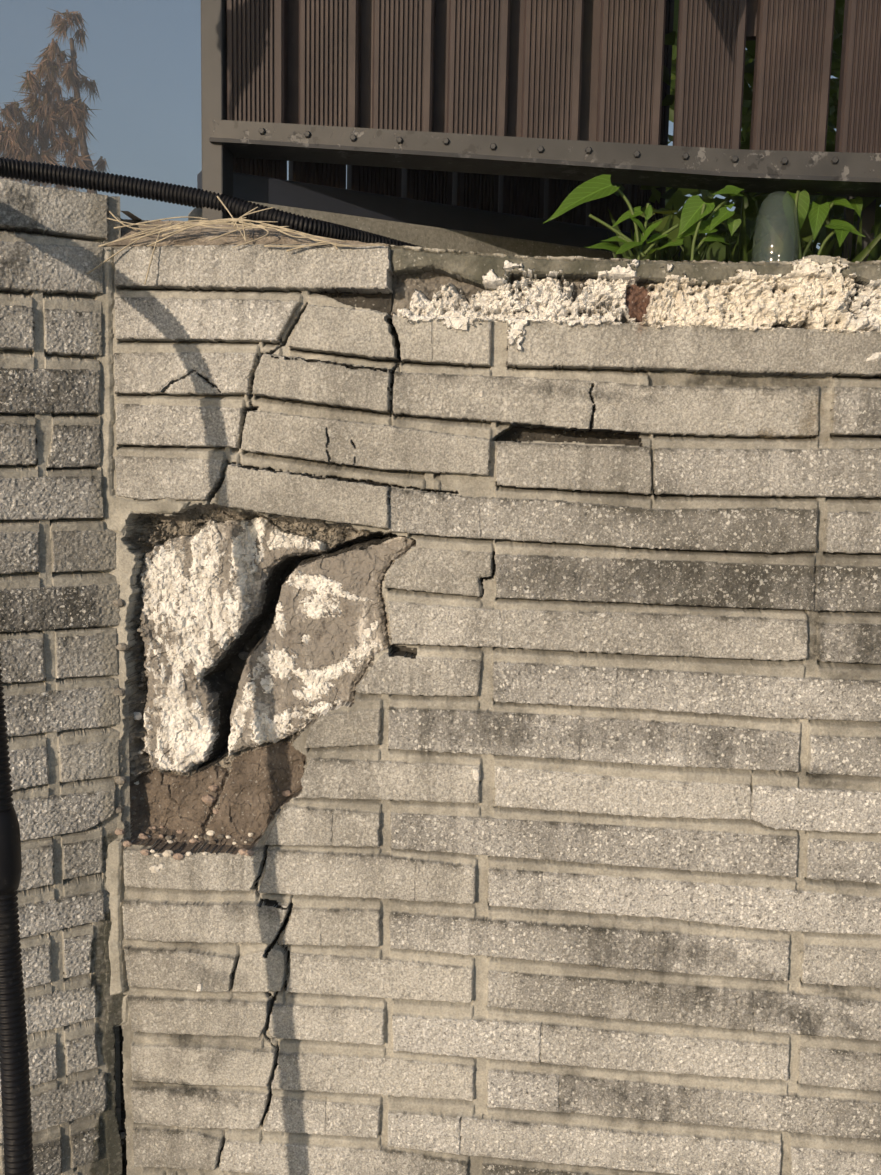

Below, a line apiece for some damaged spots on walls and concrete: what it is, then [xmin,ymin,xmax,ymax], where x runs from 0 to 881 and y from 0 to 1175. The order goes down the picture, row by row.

flaking render [392,256,881,351]
crack [162,371,220,395]
crack [244,312,402,417]
crack [588,385,596,431]
crack [213,429,459,505]
spalling [113,504,416,860]
crack [231,845,293,1124]